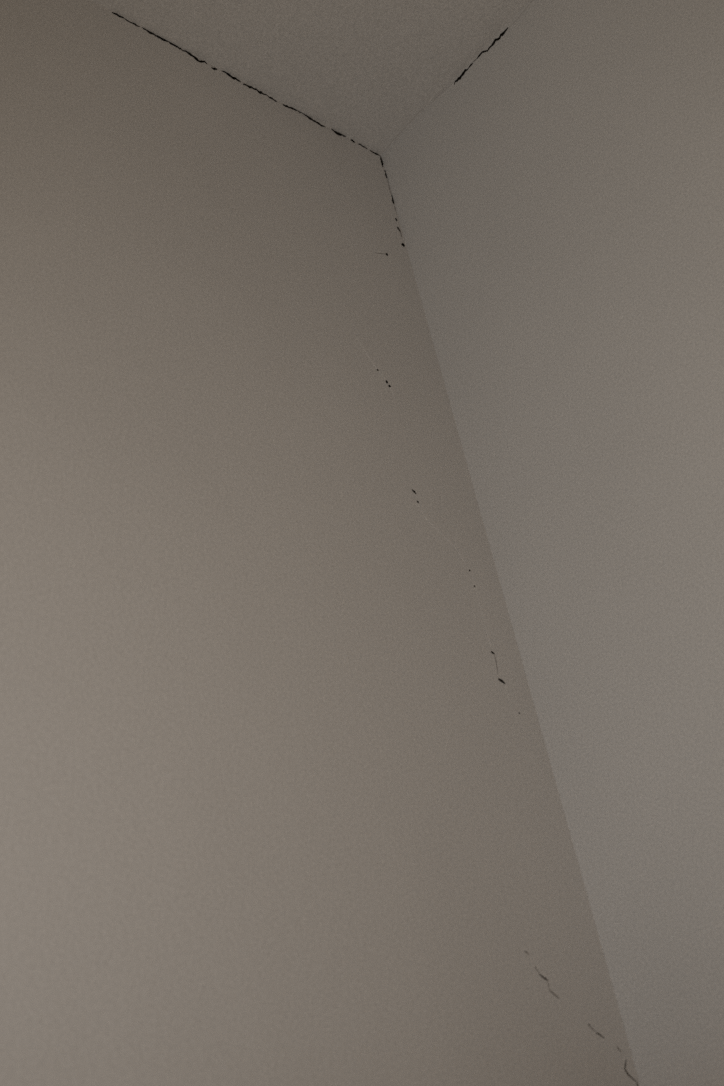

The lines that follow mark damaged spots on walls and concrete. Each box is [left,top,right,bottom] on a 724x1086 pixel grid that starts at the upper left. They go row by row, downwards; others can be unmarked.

crack [112,0,533,256]
crack [589,1024,638,1086]